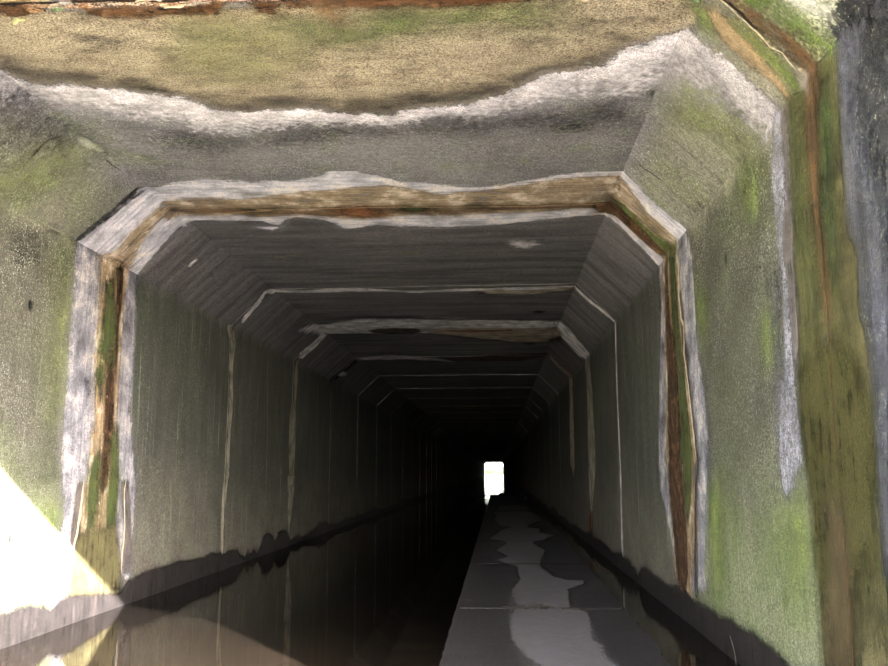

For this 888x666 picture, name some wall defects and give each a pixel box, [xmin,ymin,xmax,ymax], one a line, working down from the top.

corrosion [0,1,35,17]
corrosion [99,266,124,494]
corrosion [76,0,529,20]
water stain [0,171,790,666]
corrosion [183,201,688,593]
water stain [0,0,888,496]
corrosion [727,0,830,323]
corrosion [825,503,852,666]